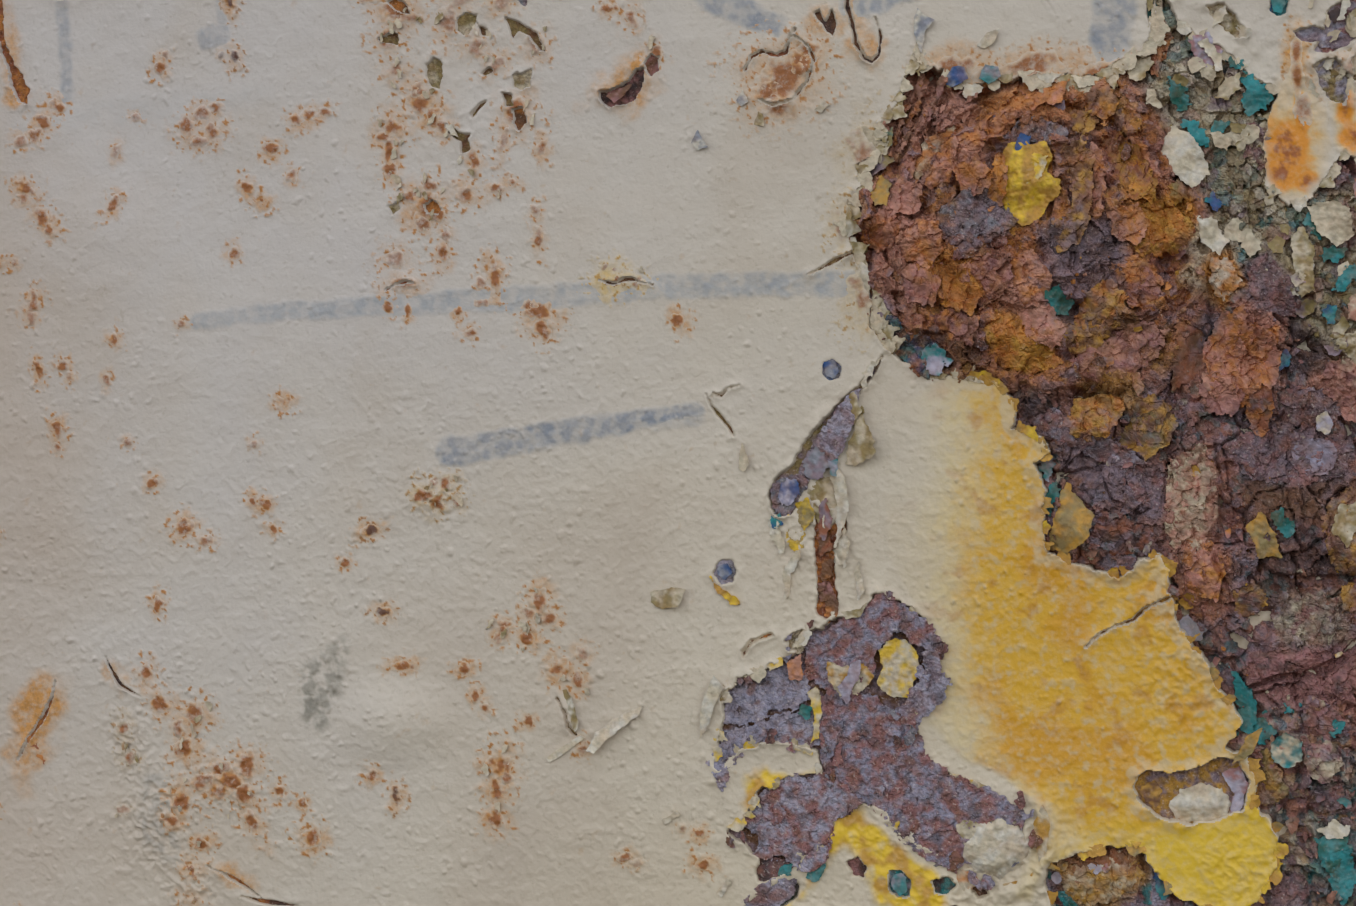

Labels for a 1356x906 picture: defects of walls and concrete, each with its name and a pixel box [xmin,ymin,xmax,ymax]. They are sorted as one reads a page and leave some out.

peeling [570,40,671,129]
rust [589,0,677,78]
peeling [797,0,847,41]
peeling [946,64,1001,87]
peeling [1295,0,1356,103]
rust [346,0,659,356]
rust [656,299,701,347]
rust [697,0,1356,906]
peeling [699,357,1050,906]
crack [1086,595,1179,646]
rust [106,648,341,906]
peeling [1135,728,1263,824]